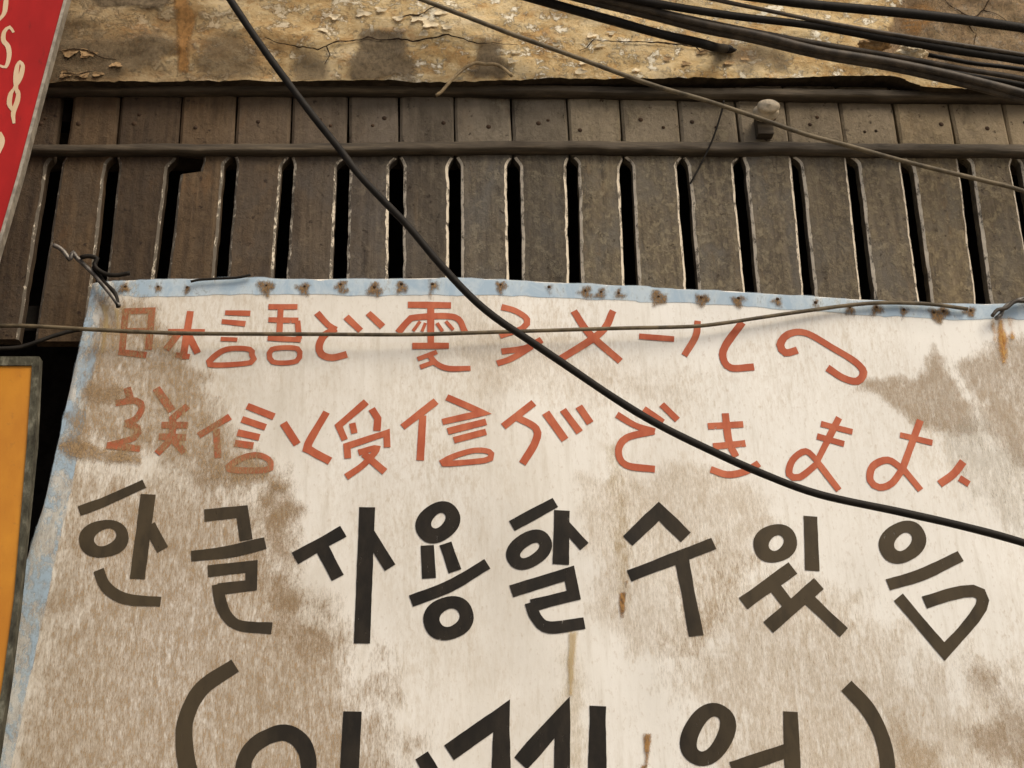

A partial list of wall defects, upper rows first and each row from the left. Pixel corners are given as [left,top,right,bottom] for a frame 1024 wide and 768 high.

peeling [61,48,98,58]
peeling [59,62,122,78]
corrosion [175,0,195,71]
damp [350,29,415,80]
crack [265,7,517,63]
peeling [356,7,453,36]
damp [470,39,507,78]
spalling [883,0,1024,81]